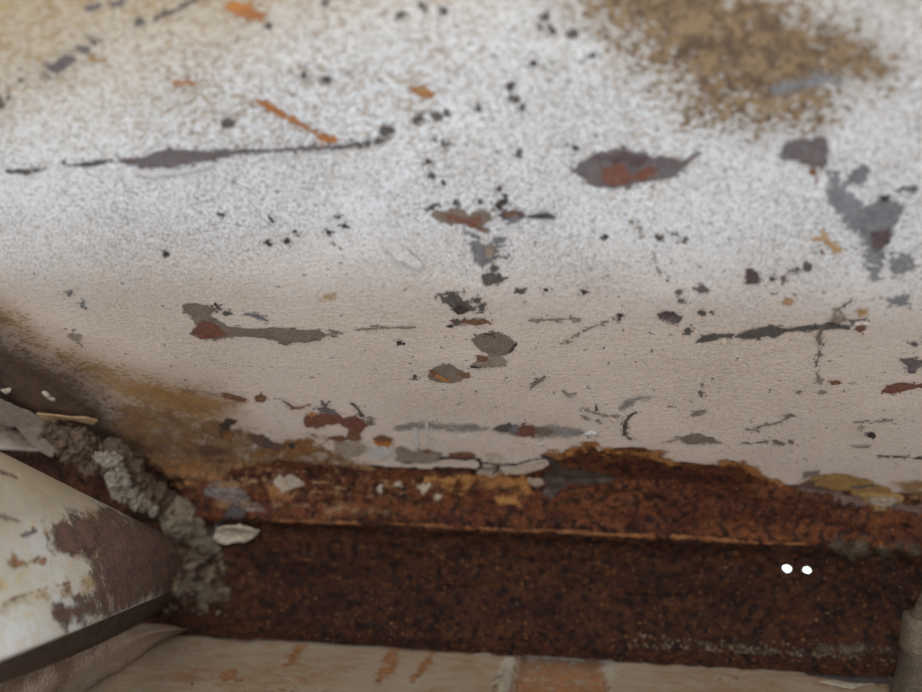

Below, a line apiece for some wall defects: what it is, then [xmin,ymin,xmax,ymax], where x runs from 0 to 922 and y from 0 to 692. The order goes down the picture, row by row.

corrosion [256,99,338,147]
peeling [408,109,451,127]
peeling [1,164,49,175]
peeling [61,123,398,178]
peeling [564,143,700,190]
peeling [777,135,918,283]
peeling [182,302,343,346]
peeling [410,186,556,384]
peeling [880,294,912,309]
peeling [881,337,922,396]
peeling [182,430,922,553]
corrosion [793,470,922,514]